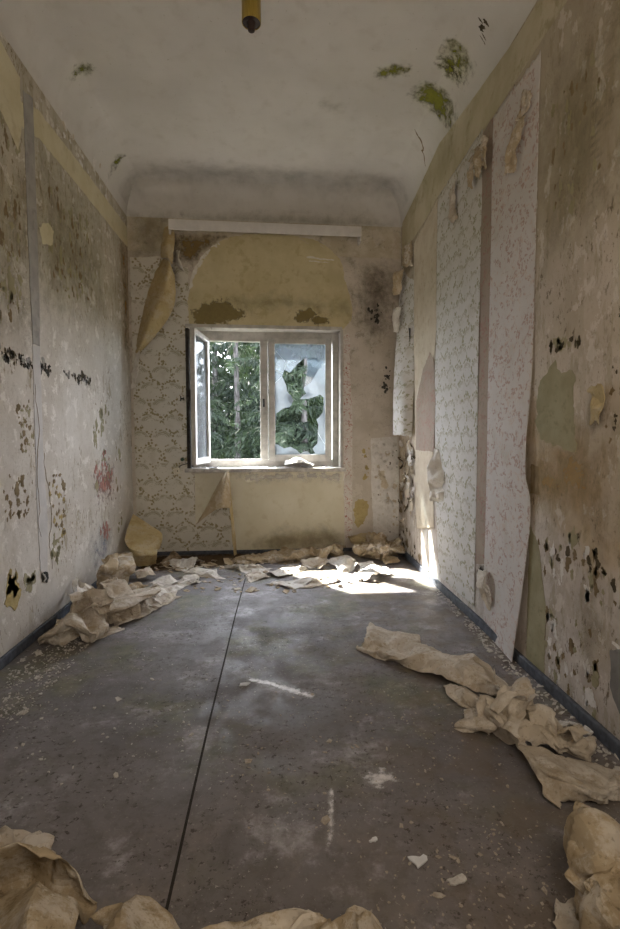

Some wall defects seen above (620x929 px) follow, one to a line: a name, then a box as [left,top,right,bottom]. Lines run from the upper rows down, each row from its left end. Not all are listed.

peeling [130,226,353,389]
spalling [535,335,581,453]
peeling [195,445,369,550]